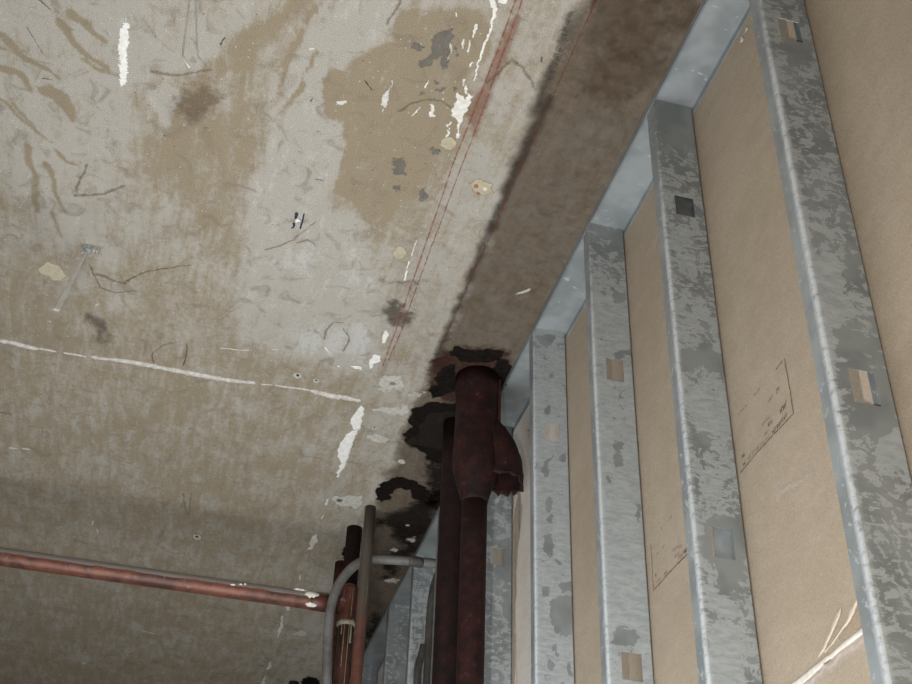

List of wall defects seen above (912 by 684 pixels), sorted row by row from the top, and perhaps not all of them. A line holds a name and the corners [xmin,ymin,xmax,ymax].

water stain [412,24,478,69]
peeling [473,0,508,81]
water stain [393,158,406,175]
water stain [403,346,511,464]
peeling [336,406,365,478]